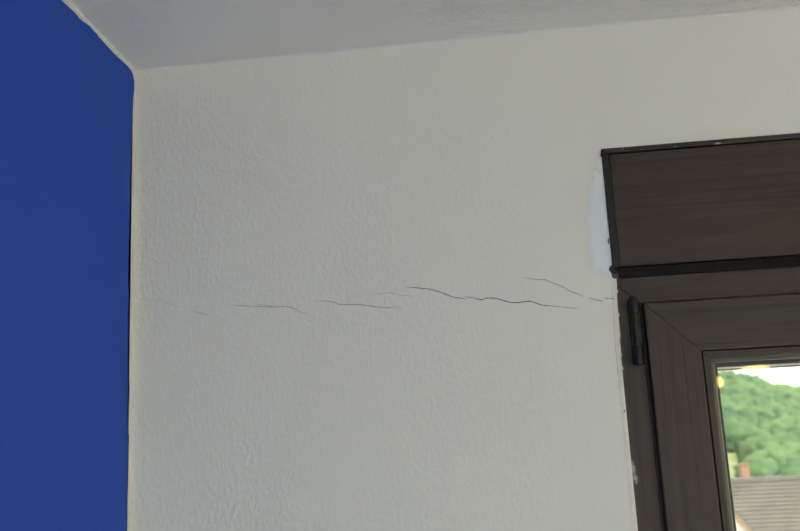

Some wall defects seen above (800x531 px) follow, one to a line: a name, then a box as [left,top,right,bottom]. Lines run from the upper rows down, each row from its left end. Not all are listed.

crack [238,277,620,395]